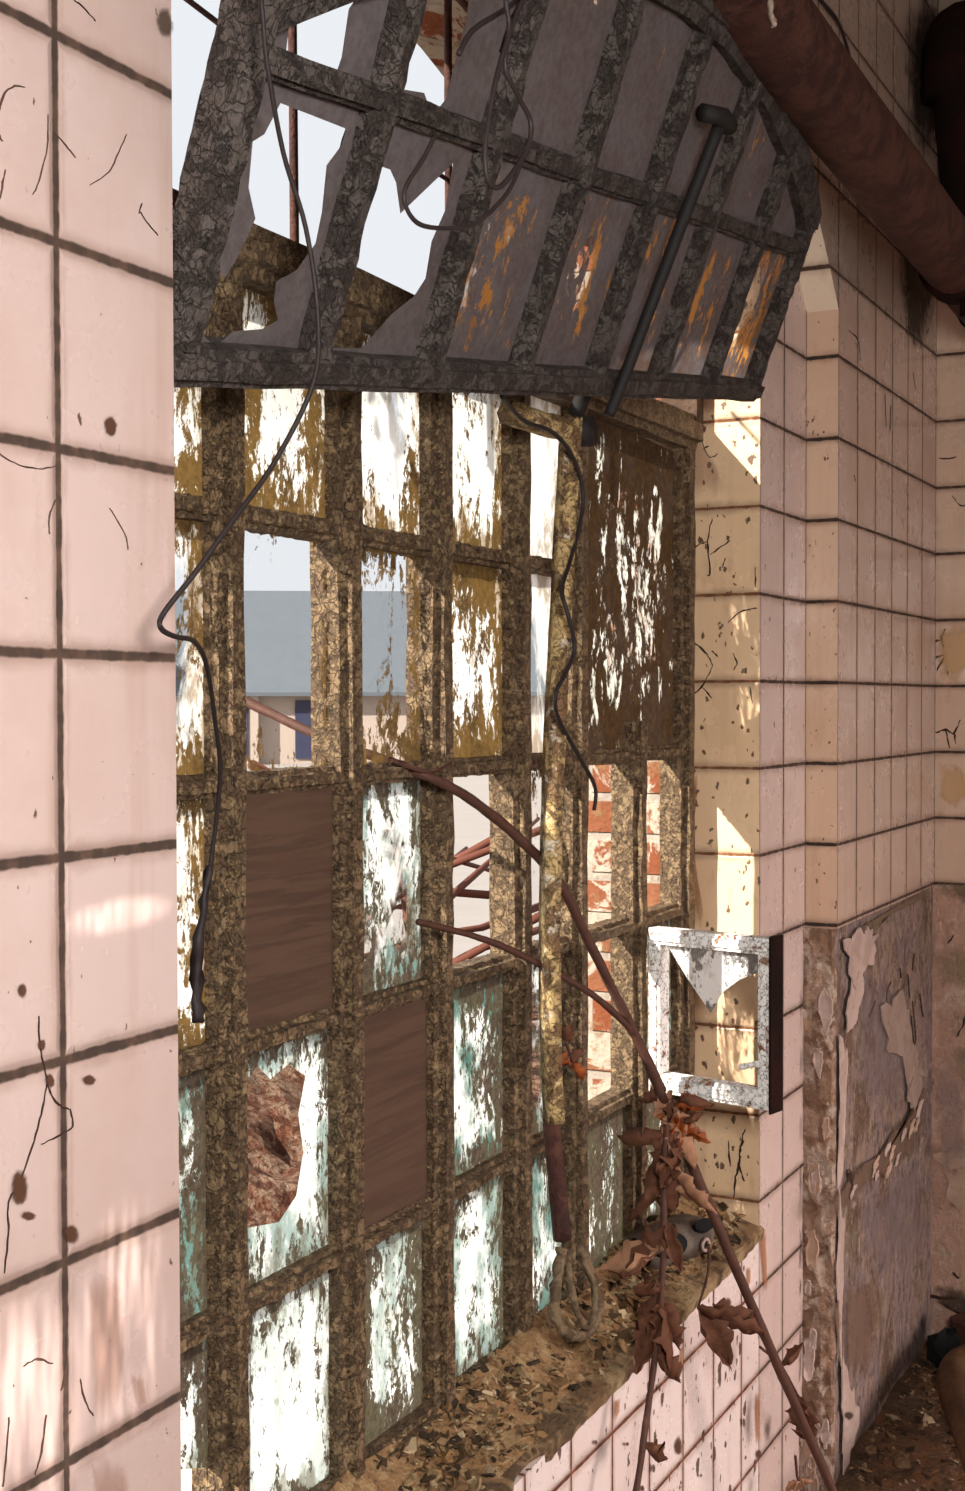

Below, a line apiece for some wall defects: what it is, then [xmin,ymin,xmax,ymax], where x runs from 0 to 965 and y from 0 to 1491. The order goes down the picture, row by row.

water stain [905,7,939,144]
spalling [799,926,927,1491]
flaking render [933,1148,965,1211]